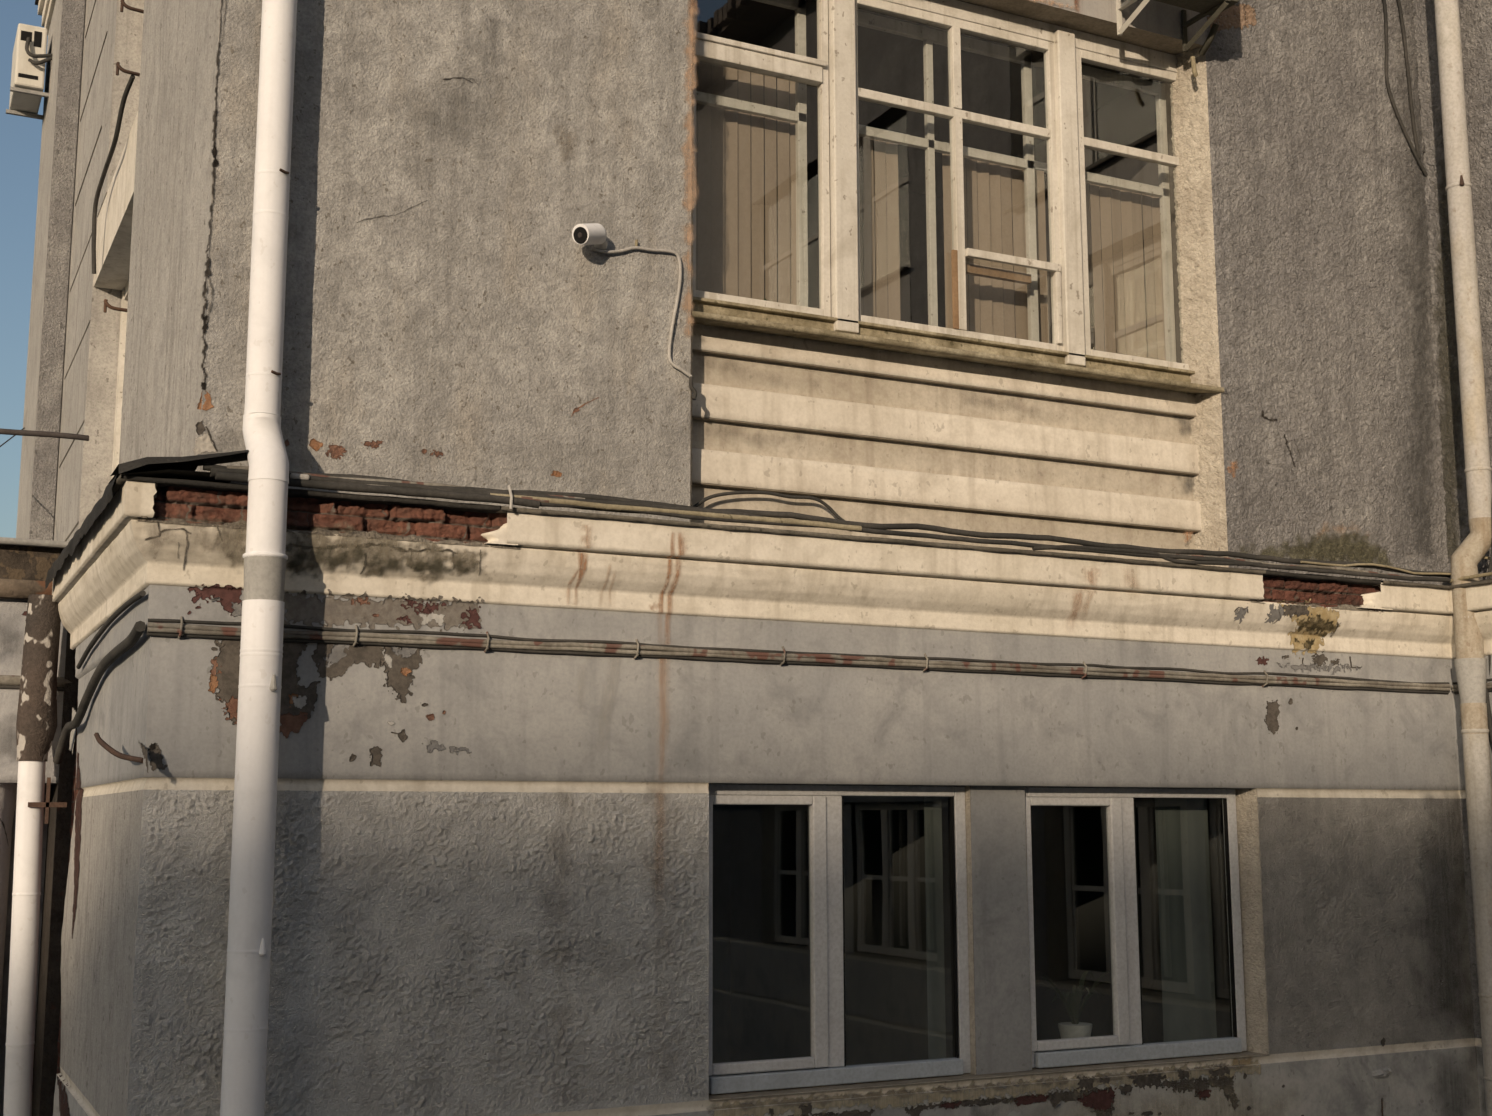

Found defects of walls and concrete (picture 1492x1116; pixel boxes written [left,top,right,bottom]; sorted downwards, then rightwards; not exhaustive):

corrosion [683,7,696,271]
crack [201,0,226,383]
corrosion [683,292,693,335]
flaking render [138,483,248,529]
peeling [187,584,242,617]
peeling [208,639,241,725]
peeling [279,589,484,739]
flaking render [286,497,520,549]
corrosion [570,536,588,588]
corrosion [660,537,682,616]
flaking render [1234,577,1393,675]
peeling [905,1065,1251,1116]